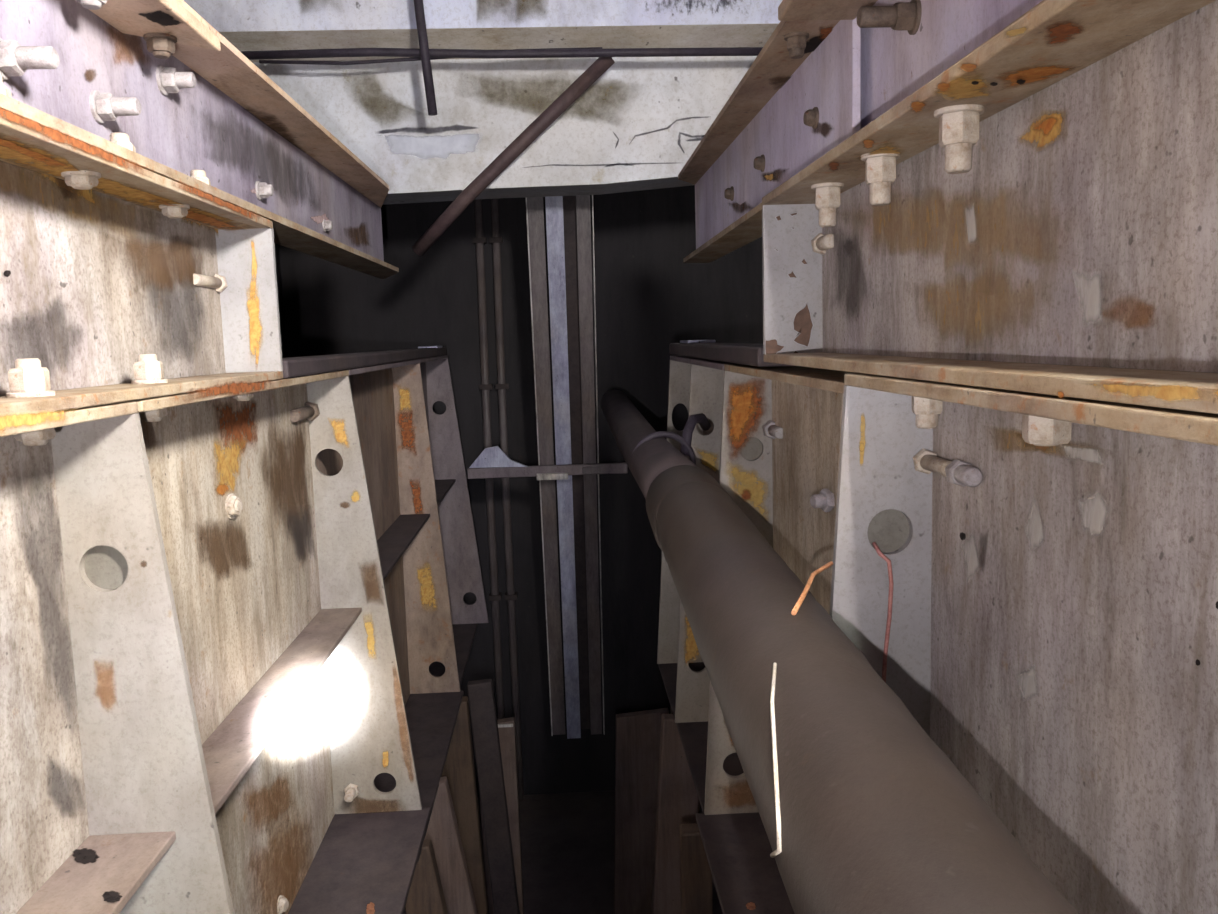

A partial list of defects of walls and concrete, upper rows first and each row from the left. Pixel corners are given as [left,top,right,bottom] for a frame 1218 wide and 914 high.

rust [138,10,182,37]
damp [478,0,542,15]
damp [646,0,736,12]
rust [0,108,259,235]
damp [359,76,477,158]
damp [482,80,623,118]
crack [524,117,705,168]
rust [859,193,1040,265]
rust [247,241,262,365]
rust [197,381,271,495]
rust [698,381,766,515]
rust [96,666,115,707]